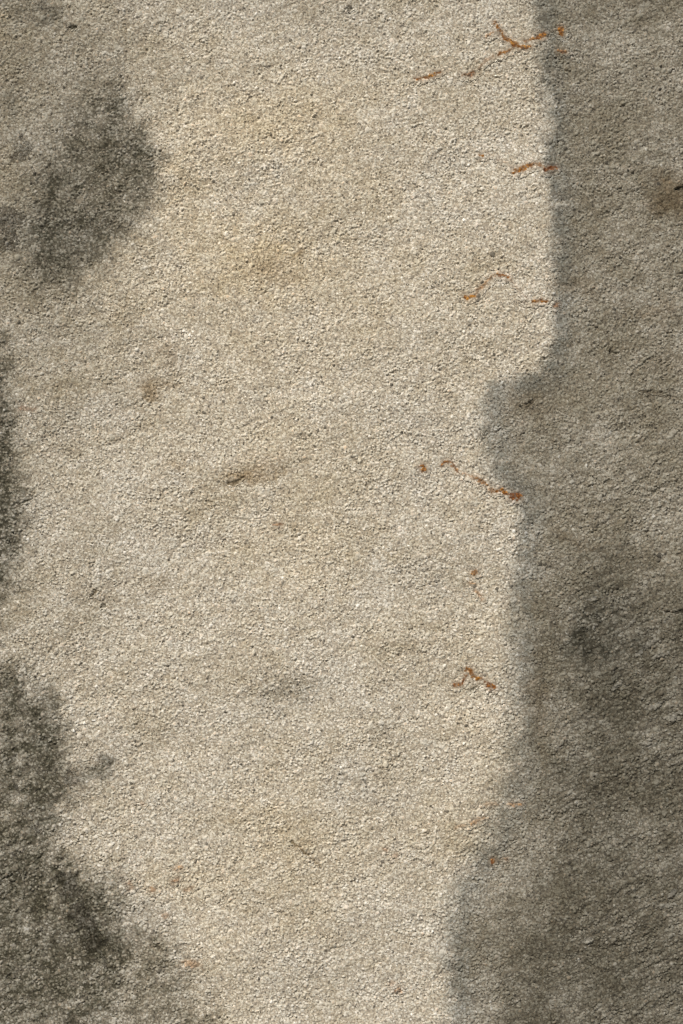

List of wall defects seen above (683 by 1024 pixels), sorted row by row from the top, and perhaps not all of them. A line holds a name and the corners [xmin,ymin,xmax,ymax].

corrosion [409,16,573,85]
corrosion [474,148,562,180]
corrosion [457,269,564,312]
corrosion [415,455,526,506]
damp [0,0,244,1024]
corrosion [447,662,501,695]